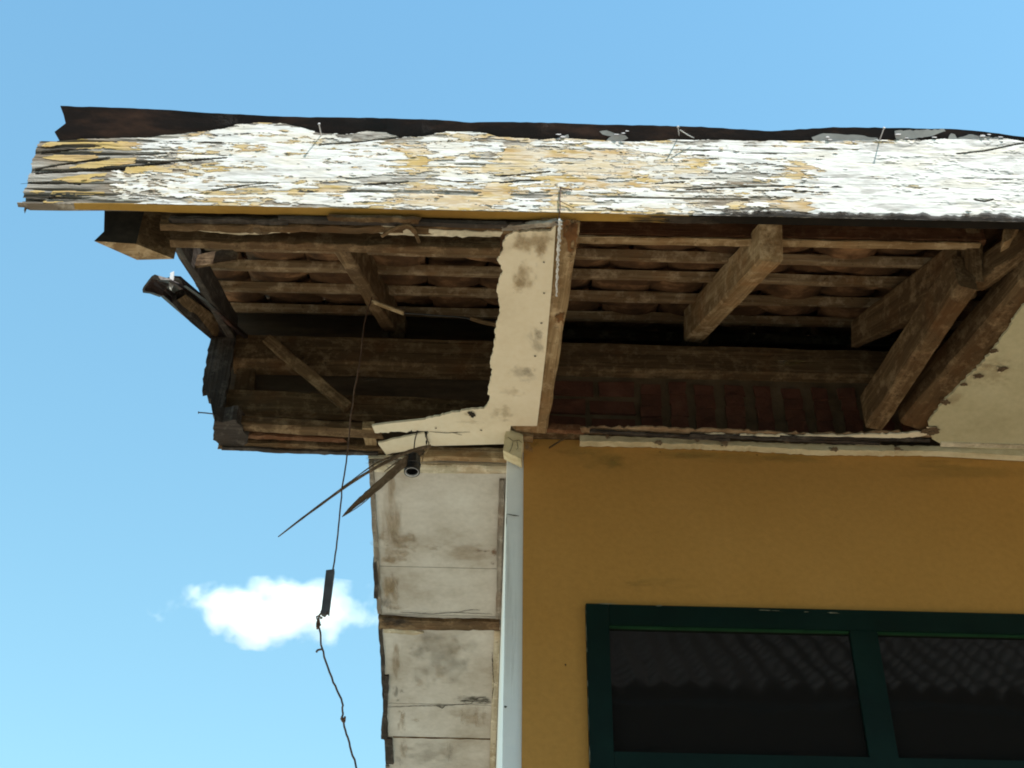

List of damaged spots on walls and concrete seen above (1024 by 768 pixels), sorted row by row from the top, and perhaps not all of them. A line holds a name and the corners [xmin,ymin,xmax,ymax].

peeling [30,122,1024,222]